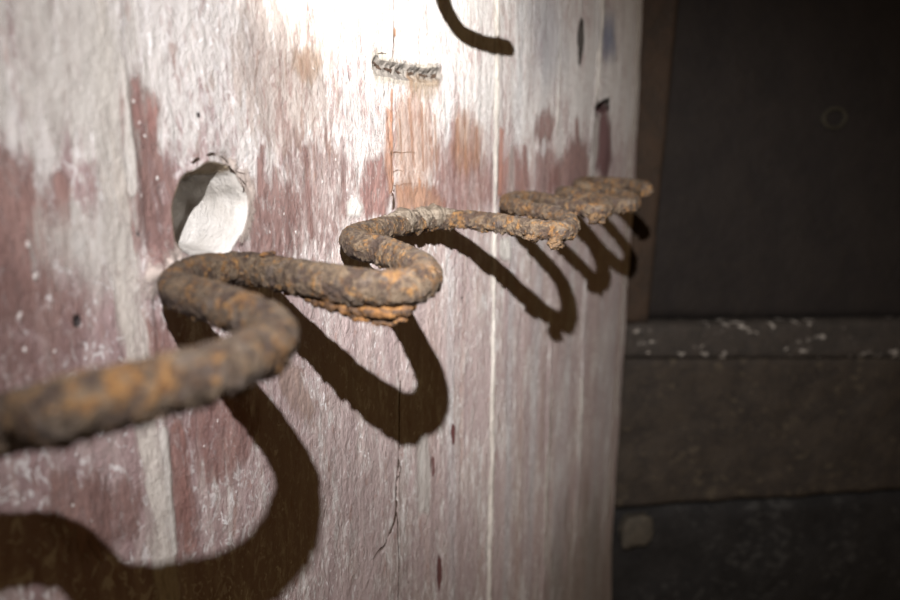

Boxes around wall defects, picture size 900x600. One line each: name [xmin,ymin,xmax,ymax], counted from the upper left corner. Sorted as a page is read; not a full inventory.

spalling [116,76,313,298]
crack [373,380,401,596]